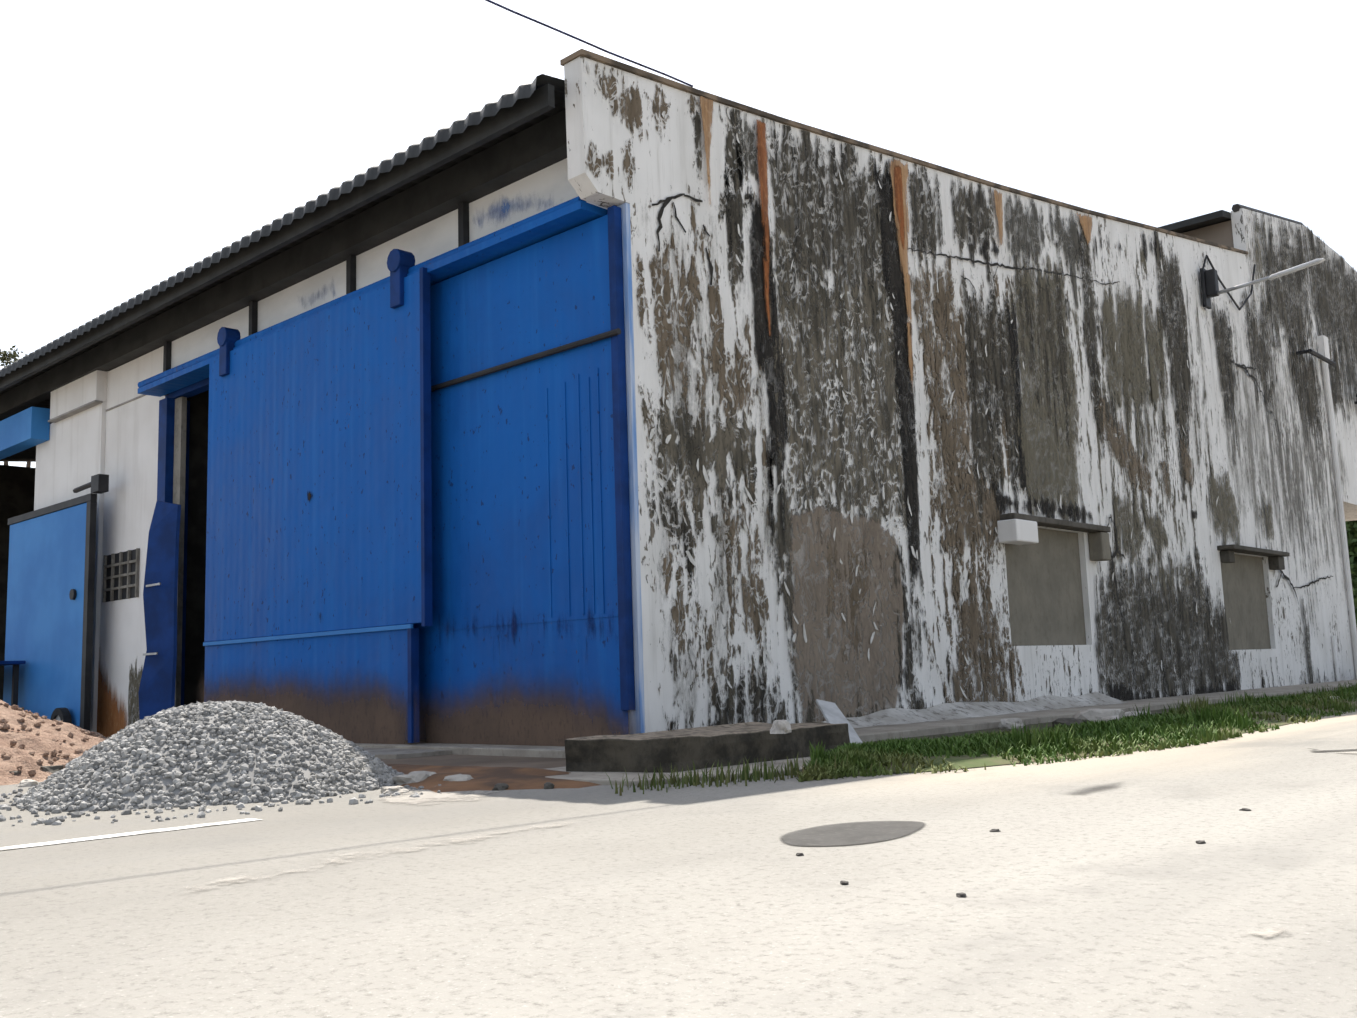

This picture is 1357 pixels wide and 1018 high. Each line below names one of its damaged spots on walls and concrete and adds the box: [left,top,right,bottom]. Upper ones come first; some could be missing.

peeling [587,63,671,190]
crack [652,193,713,285]
corrosion [756,120,771,336]
damp [721,107,933,723]
peeling [637,174,1109,730]
corrosion [890,159,913,384]
damp [960,226,1123,534]
peeling [1045,222,1244,579]
damp [1124,214,1357,560]
corrosion [97,665,129,737]
corrosion [203,682,633,746]
mould [1095,535,1242,701]